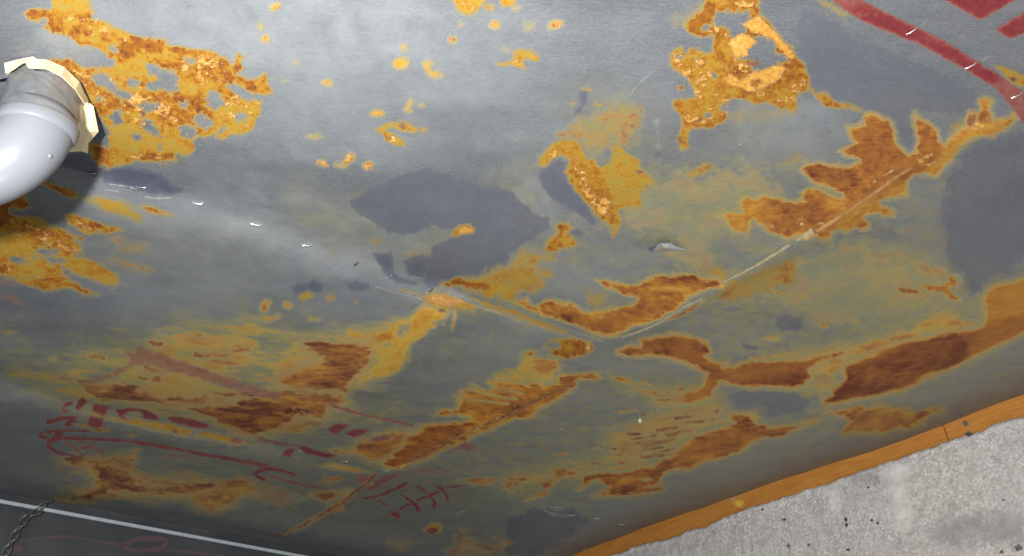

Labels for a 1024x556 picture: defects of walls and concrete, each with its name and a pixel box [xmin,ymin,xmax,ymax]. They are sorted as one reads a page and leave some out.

rust [24,0,273,169]
rust [317,154,373,170]
rust [371,100,427,147]
rust [393,45,409,69]
rust [452,0,516,30]
rust [496,48,540,70]
rust [537,87,656,237]
rust [670,0,1018,241]
rust [0,181,171,296]
leakage [351,169,549,287]
rust [8,221,1024,502]
rust [59,449,258,513]